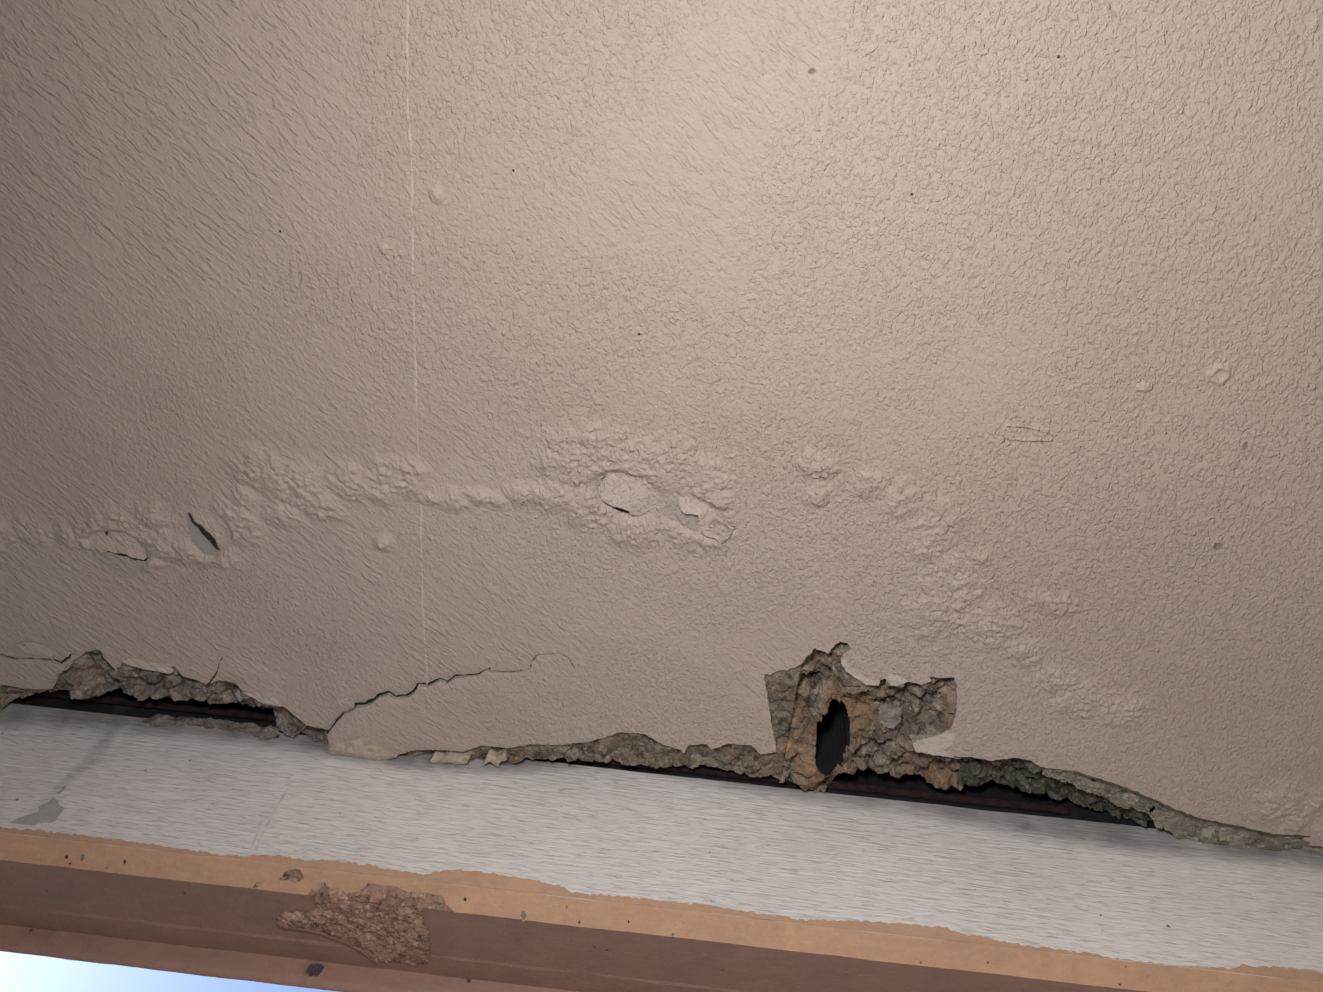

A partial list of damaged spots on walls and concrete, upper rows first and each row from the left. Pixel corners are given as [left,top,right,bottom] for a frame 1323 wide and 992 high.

peeling [187,510,228,555]
peeling [594,473,735,540]
crack [1,654,72,663]
crack [328,653,575,732]
spalling [0,641,1323,855]
corrosion [786,701,818,774]
flaking render [253,869,454,965]